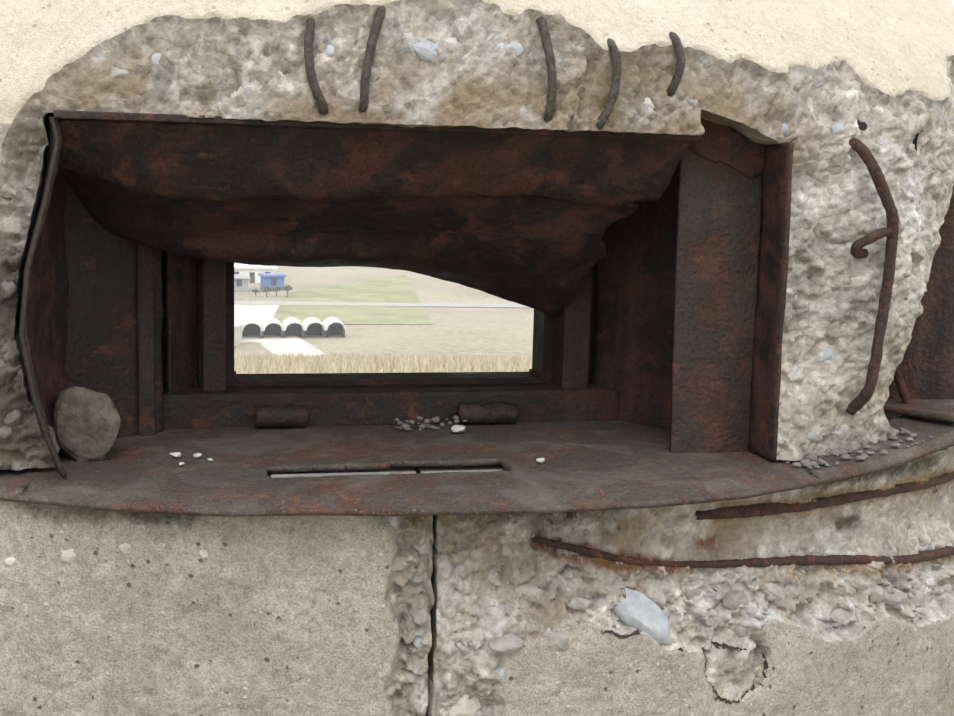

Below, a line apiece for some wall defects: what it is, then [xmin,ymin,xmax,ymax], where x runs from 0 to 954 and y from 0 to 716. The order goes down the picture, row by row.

spalling [0,0,954,471]
corrosion [531,540,691,574]
spalling [383,446,954,716]